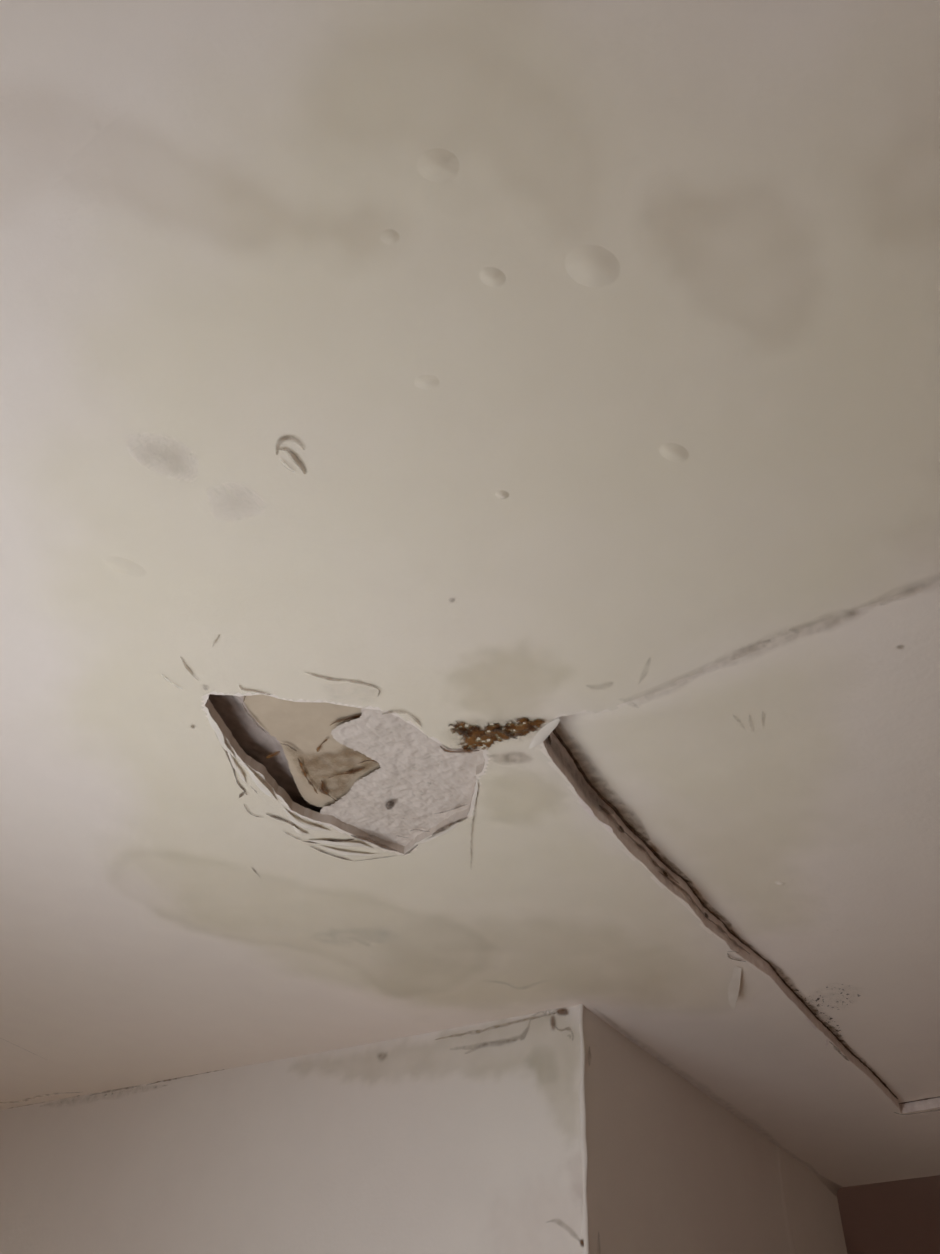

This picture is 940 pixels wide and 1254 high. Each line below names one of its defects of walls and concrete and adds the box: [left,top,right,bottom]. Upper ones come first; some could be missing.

spalling [205,685,485,861]
rust [440,718,546,753]
crack [529,718,940,1114]